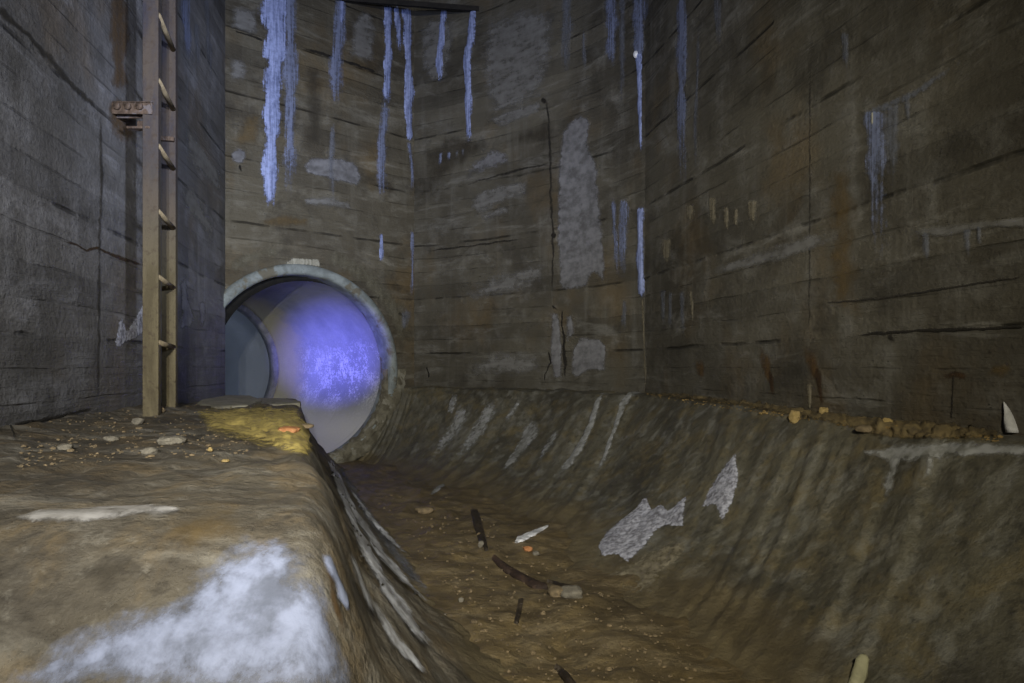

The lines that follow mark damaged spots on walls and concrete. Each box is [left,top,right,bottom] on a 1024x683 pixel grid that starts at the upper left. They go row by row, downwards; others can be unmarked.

water stain [260,0,298,204]
water stain [378,6,415,189]
water stain [433,10,477,175]
water stain [607,0,645,147]
spalling [115,305,143,346]
crack [433,240,513,251]
crack [478,98,556,281]
peeling [557,116,604,289]
water stain [611,201,646,380]
spalling [598,497,686,562]
spalling [703,454,738,519]
water stain [33,546,344,683]